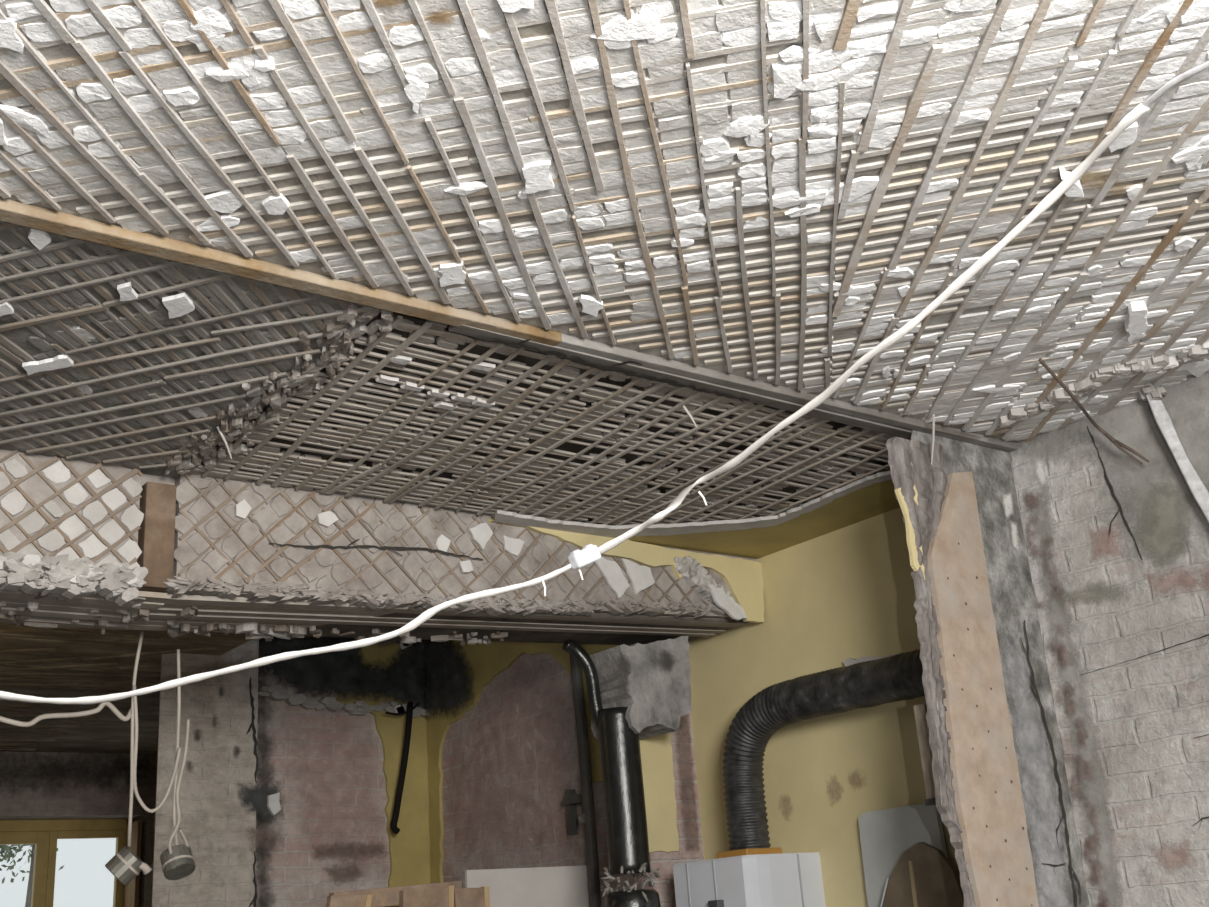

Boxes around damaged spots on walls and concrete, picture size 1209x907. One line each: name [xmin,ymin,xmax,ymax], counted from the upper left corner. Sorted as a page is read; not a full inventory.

peeling [497,0,534,13]
peeling [0,17,24,54]
peeling [404,75,428,114]
peeling [522,160,554,194]
peeling [117,282,138,301]
peeling [162,292,195,319]
peeling [579,295,603,317]
peeling [22,355,74,375]
peeling [376,355,496,411]
crack [1087,426,1143,560]
spalling [468,436,976,907]
crack [1081,634,1209,675]